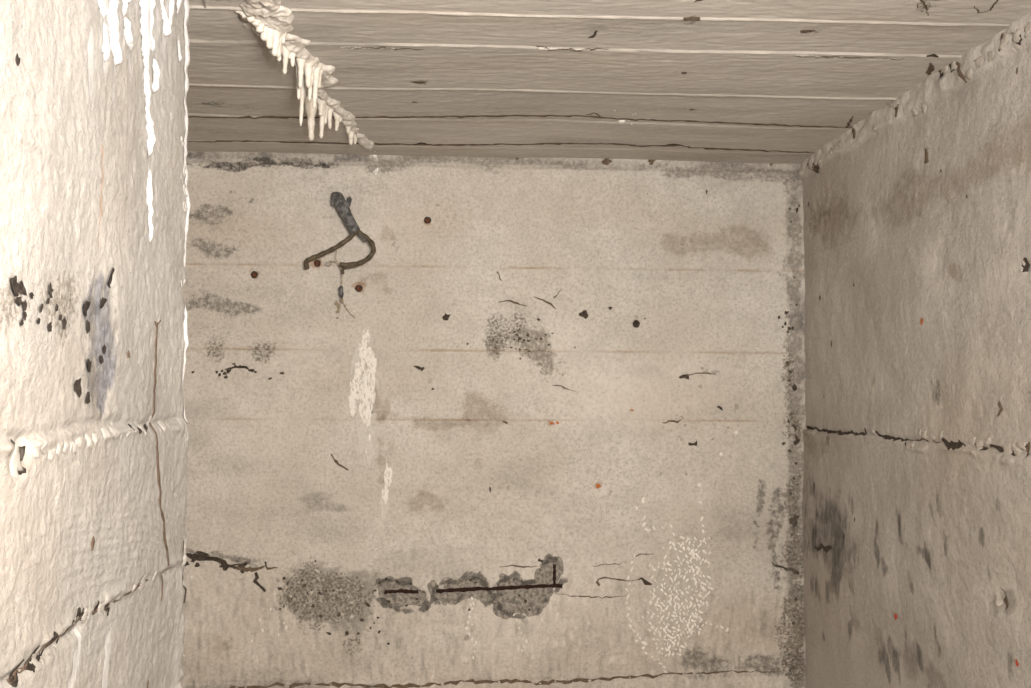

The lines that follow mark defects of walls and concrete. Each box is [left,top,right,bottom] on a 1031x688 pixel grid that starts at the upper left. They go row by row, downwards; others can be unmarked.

water stain [87,0,235,267]
water stain [206,0,380,175]
crack [149,314,278,601]
water stain [182,296,258,424]
water stain [348,329,379,466]
water stain [487,313,554,360]
crack [806,426,1027,456]
spalling [374,554,567,619]
water stain [625,497,729,673]